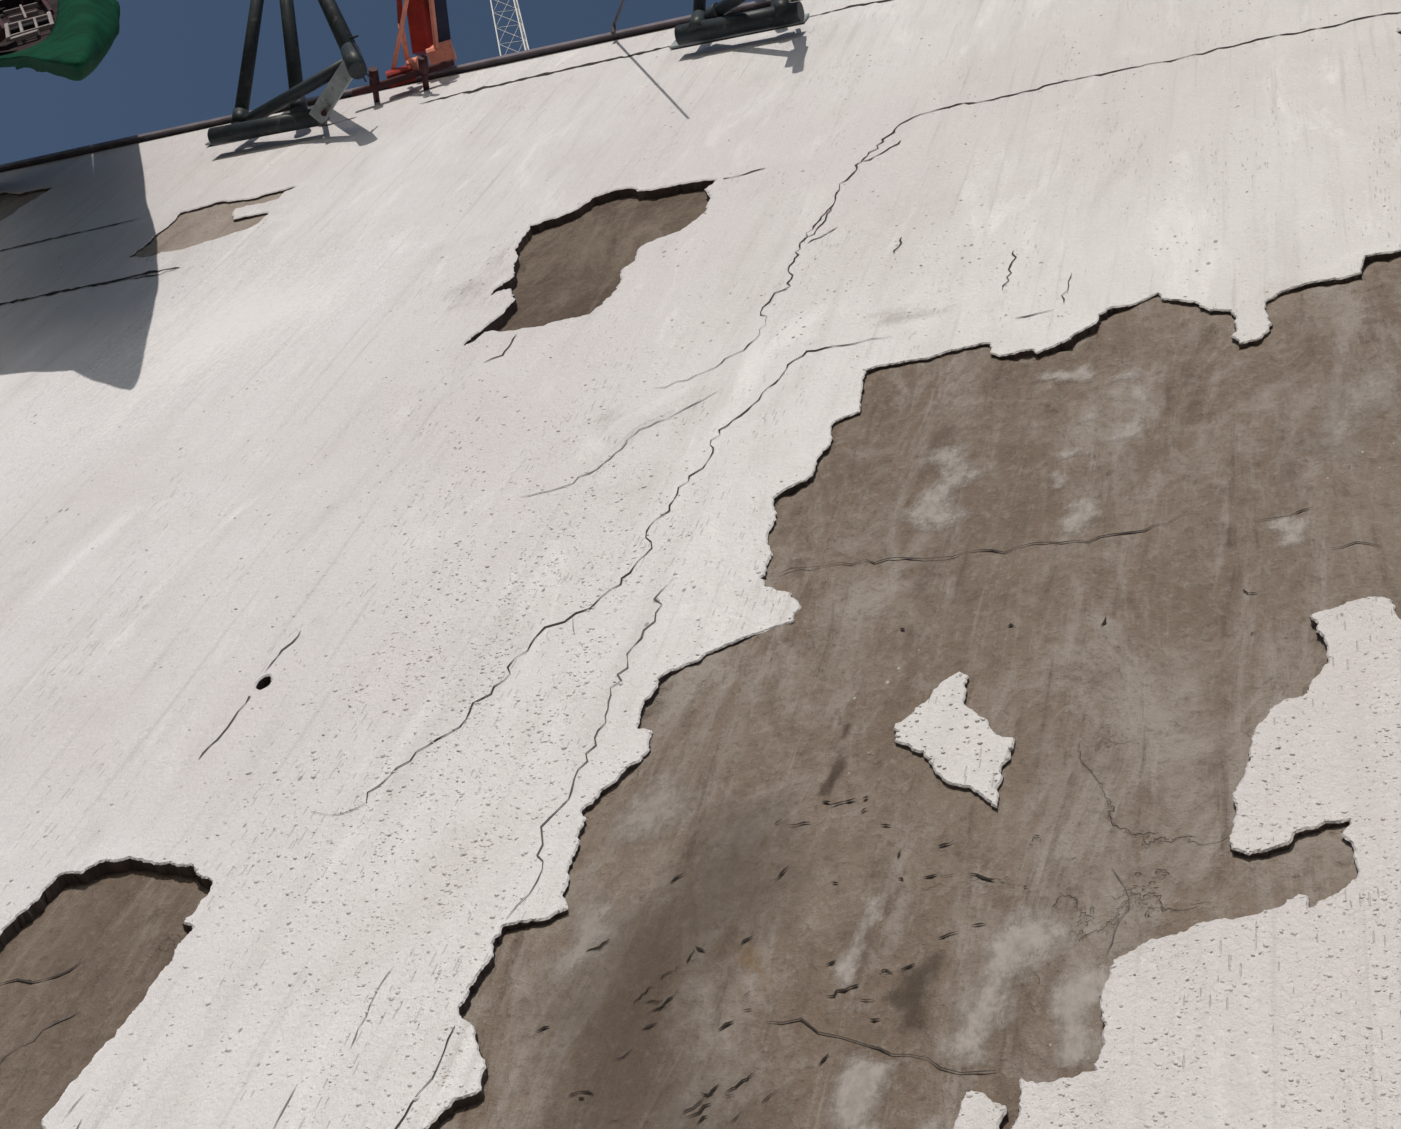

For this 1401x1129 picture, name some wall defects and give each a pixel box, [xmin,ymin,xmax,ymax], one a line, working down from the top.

spalling [0,191,47,221]
crack [0,218,140,251]
crack [0,267,179,305]
spalling [133,193,283,258]
spalling [498,190,710,332]
crack [312,12,1401,815]
crack [199,630,301,758]
crack [507,577,674,917]
spalling [436,256,1401,1129]
spalling [0,868,210,1129]
crack [351,967,393,1045]
crack [394,1026,455,1129]